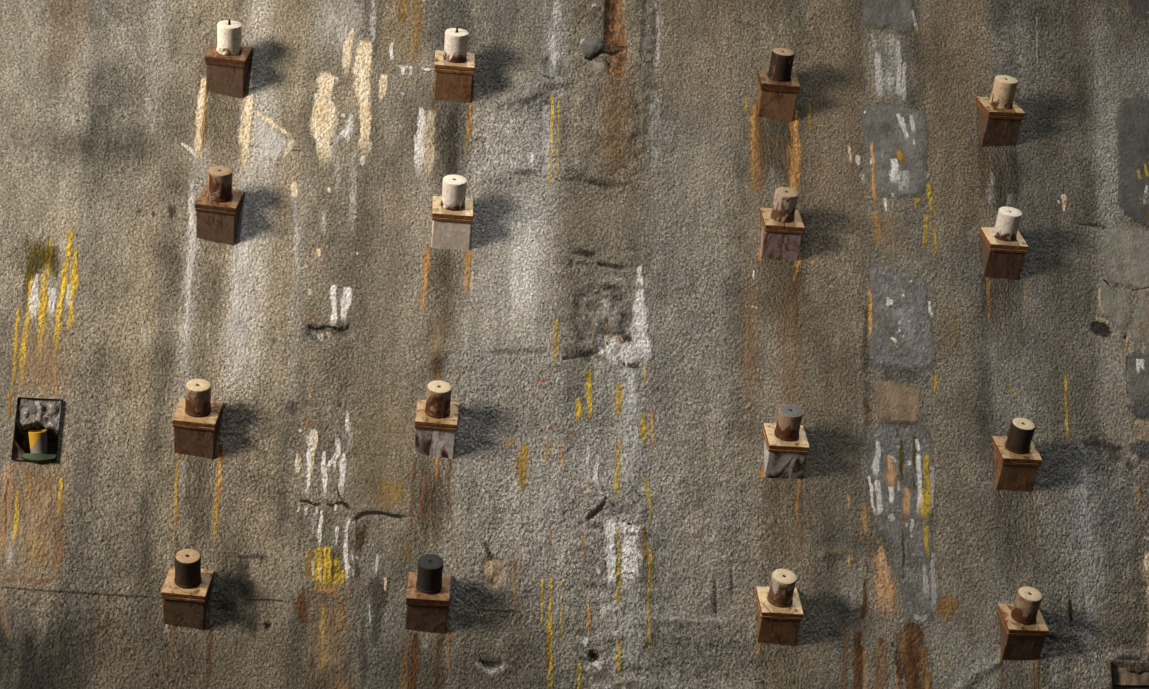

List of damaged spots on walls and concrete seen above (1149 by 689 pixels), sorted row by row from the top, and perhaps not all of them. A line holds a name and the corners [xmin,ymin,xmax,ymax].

water stain [389,42,431,75]
water stain [310,0,404,225]
water stain [414,108,436,170]
water stain [290,182,299,268]
spalling [306,315,355,345]
spalling [573,284,638,368]
water stain [295,411,351,494]
water stain [297,506,359,586]
crack [300,488,403,551]
water stain [372,555,387,638]
corrosion [848,505,898,620]
corrosion [852,623,932,689]